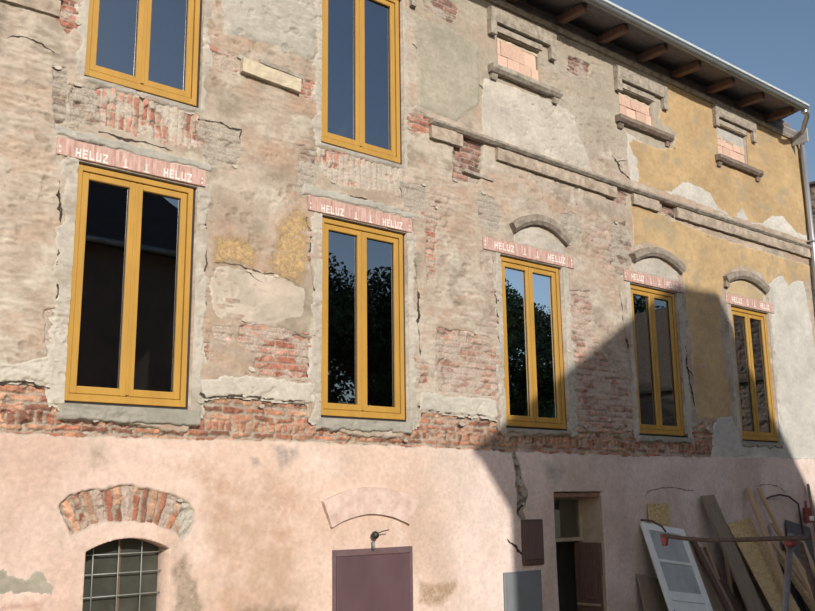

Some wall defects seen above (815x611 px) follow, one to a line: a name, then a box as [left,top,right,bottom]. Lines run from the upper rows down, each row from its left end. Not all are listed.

crack [7,35,54,52]
flaking render [56,0,82,34]
flaking render [49,66,245,169]
peeling [629,83,806,236]
crack [55,181,63,223]
peeling [0,191,811,458]
crack [414,262,422,355]
crack [685,346,695,407]
crack [509,446,528,520]
peeling [0,568,54,595]